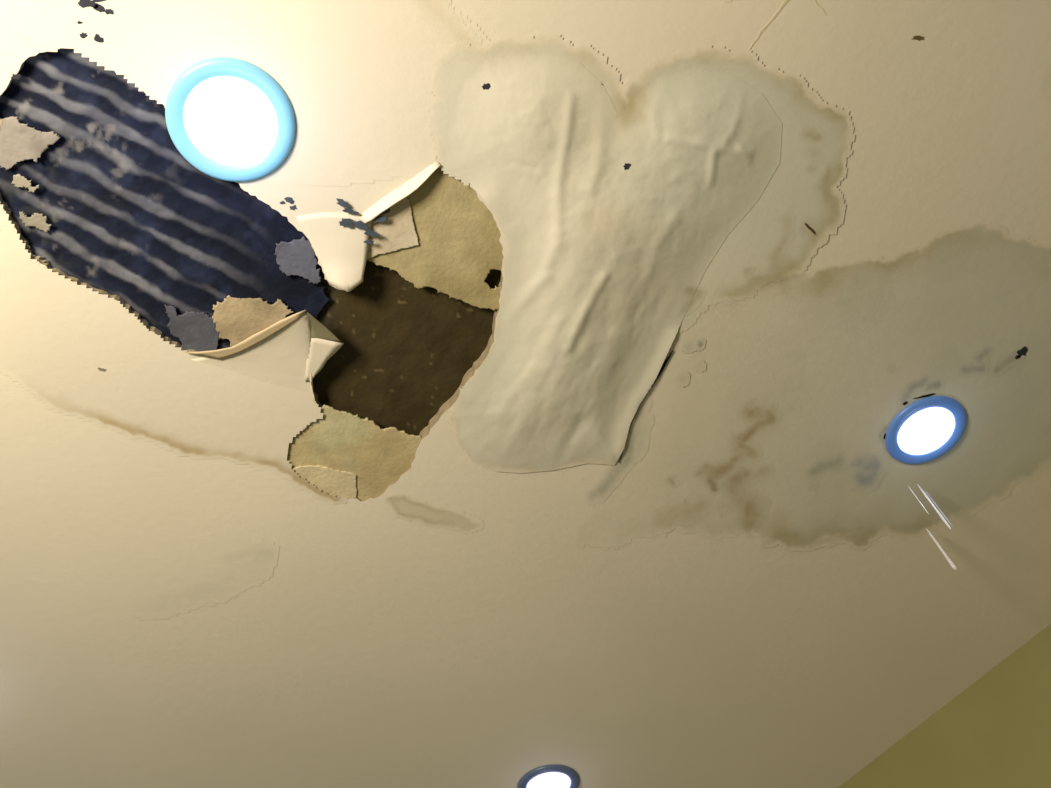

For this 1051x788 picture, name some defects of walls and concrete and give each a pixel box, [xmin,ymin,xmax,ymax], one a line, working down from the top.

peeling [76,21,104,43]
peeling [78,0,114,15]
crack [749,0,789,50]
peeling [0,48,503,500]
damp [0,0,1051,570]